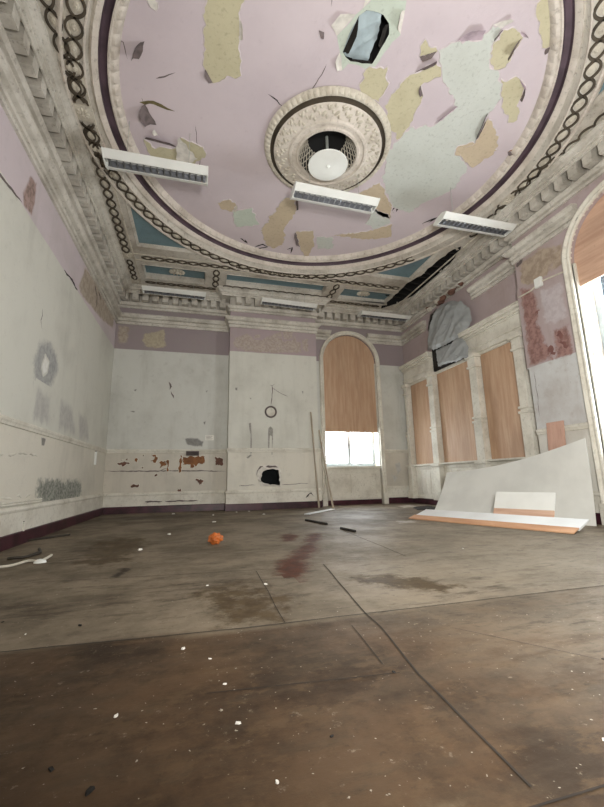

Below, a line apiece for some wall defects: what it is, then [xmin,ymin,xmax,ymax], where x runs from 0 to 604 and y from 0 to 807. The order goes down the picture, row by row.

peeling [202,0,245,84]
peeling [534,0,550,55]
peeling [139,105,207,164]
peeling [319,0,528,240]
peeling [256,197,315,256]
peeling [516,240,577,370]
peeling [116,454,224,477]
spalling [257,465,282,487]
water stain [159,532,487,648]